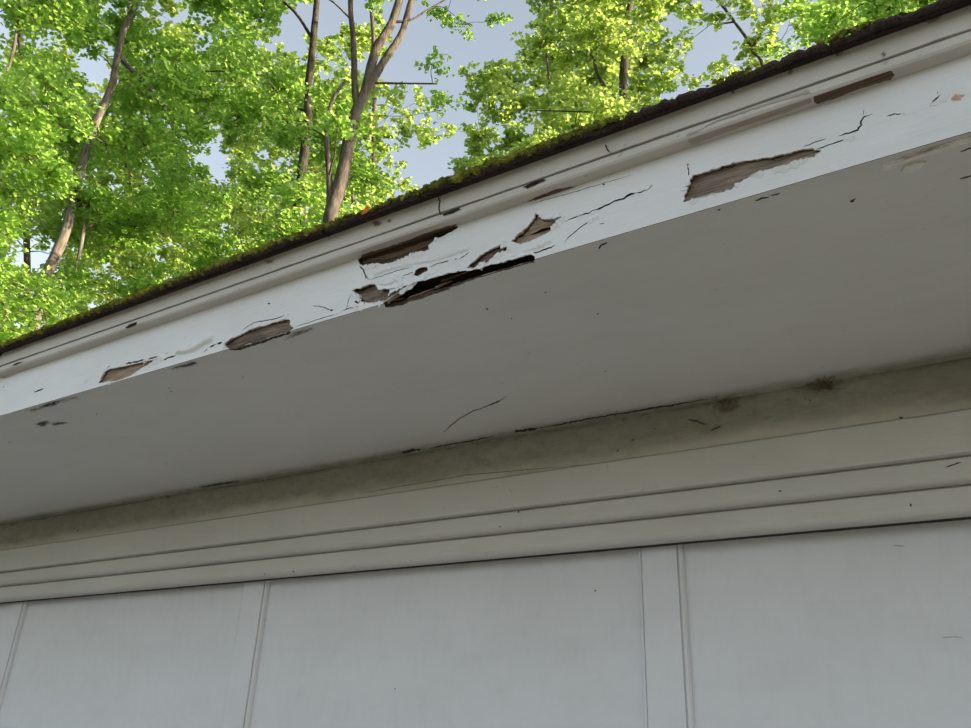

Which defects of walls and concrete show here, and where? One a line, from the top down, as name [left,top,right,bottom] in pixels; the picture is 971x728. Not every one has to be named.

crack [929,91,949,106]
crack [804,110,906,149]
peeling [680,148,821,206]
crack [527,176,653,253]
peeling [351,212,565,307]
peeling [222,313,297,351]
peeling [99,352,166,385]
mould [785,352,971,409]
crack [402,396,721,453]
leakage [0,393,767,542]